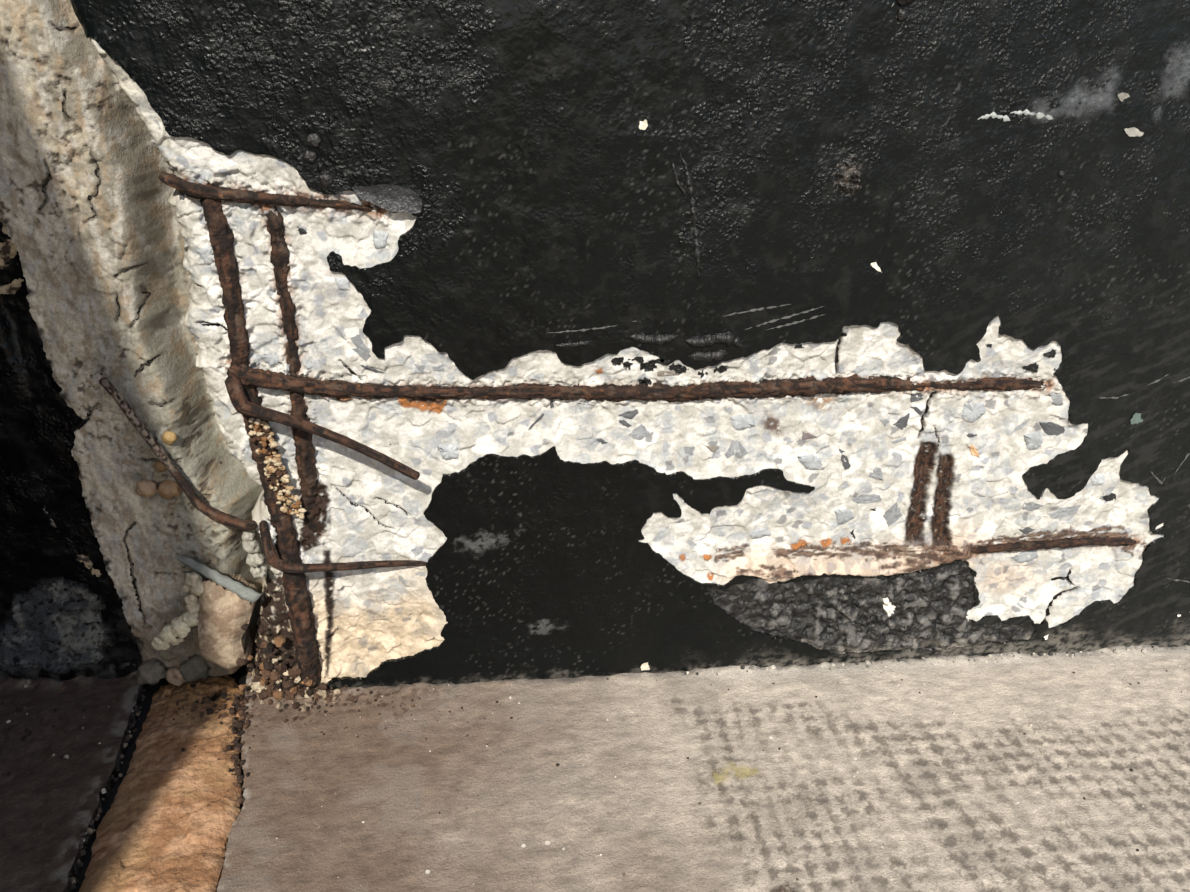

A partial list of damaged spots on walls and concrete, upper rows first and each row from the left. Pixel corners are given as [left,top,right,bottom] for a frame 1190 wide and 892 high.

crack [86,152,101,222]
crack [114,264,151,325]
crack [135,354,161,377]
spalling [90,37,1164,686]
corrosion [398,397,447,414]
corrosion [703,442,1135,580]
corrosion [248,418,334,683]